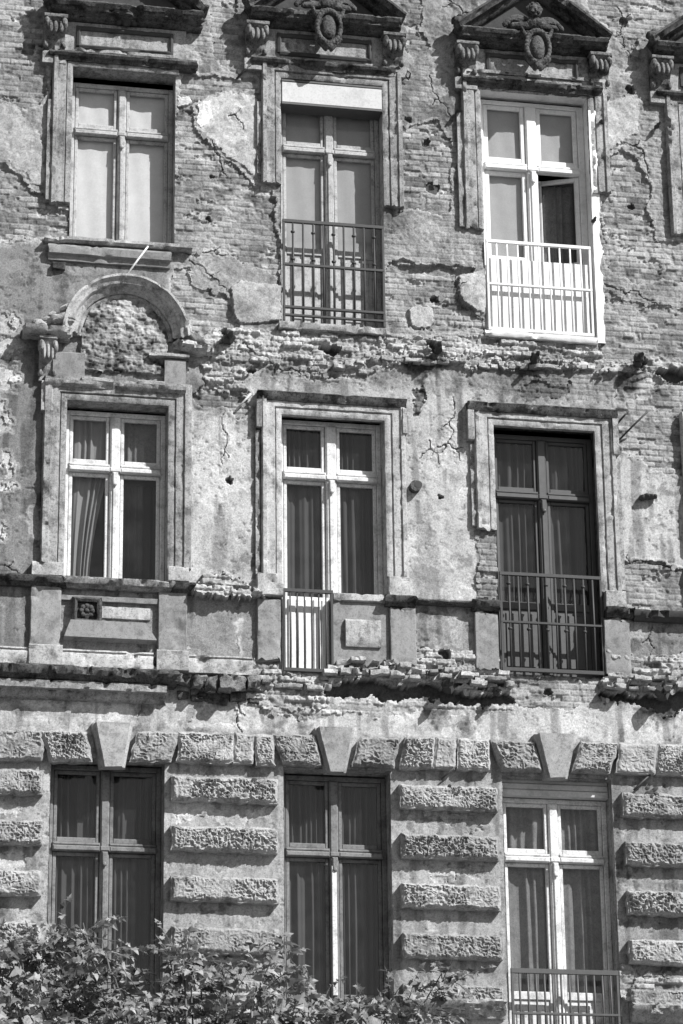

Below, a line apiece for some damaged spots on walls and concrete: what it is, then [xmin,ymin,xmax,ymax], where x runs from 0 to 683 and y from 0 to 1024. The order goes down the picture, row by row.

spalling [0,0,69,243]
crack [212,139,227,181]
crack [620,140,649,179]
crack [188,246,234,290]
spalling [170,0,683,482]
spalling [0,298,168,431]
crack [419,396,464,464]
spalling [474,528,498,600]
spalling [625,559,683,611]
spalling [184,647,683,729]